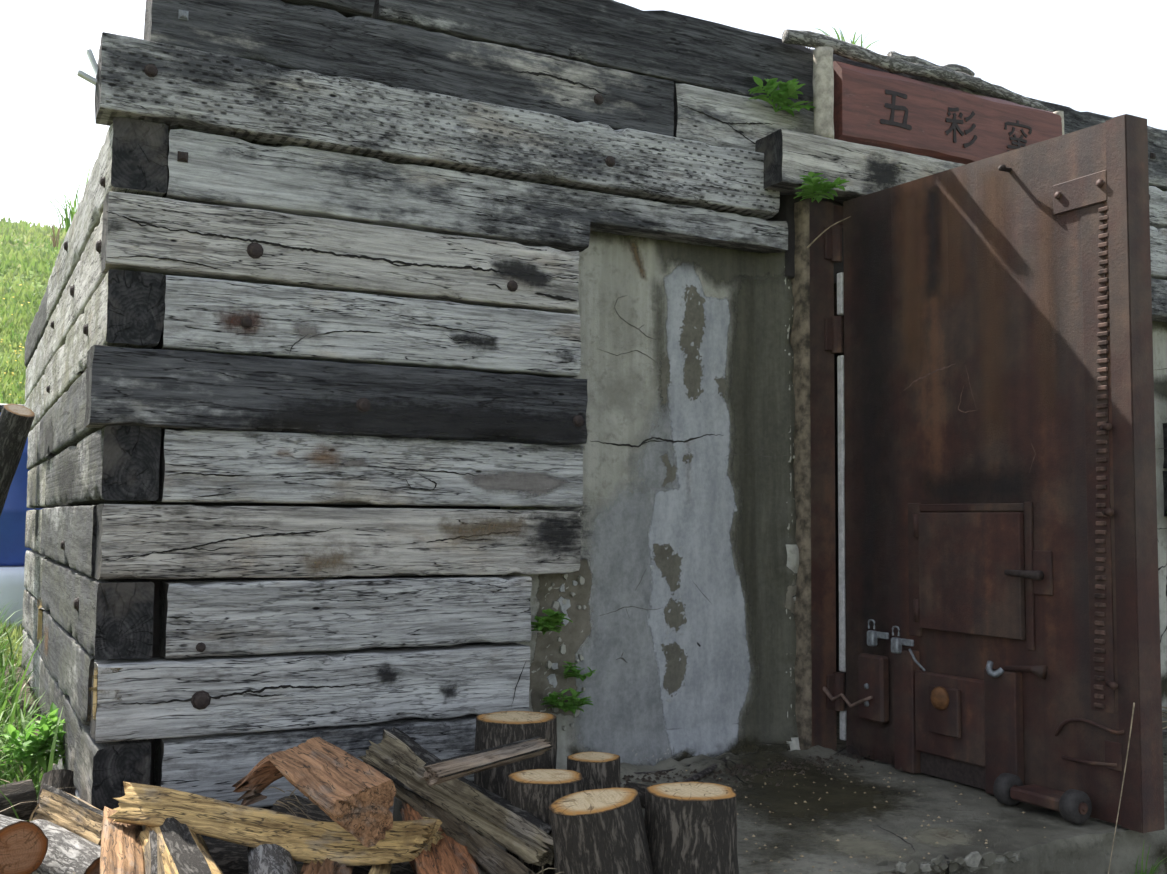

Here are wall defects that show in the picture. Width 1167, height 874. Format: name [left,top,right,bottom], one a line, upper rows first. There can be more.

damp [492,260,552,287]
peeling [658,284,728,410]
damp [463,472,567,495]
crack [591,434,723,447]
damp [528,230,917,865]
peeling [650,543,689,703]